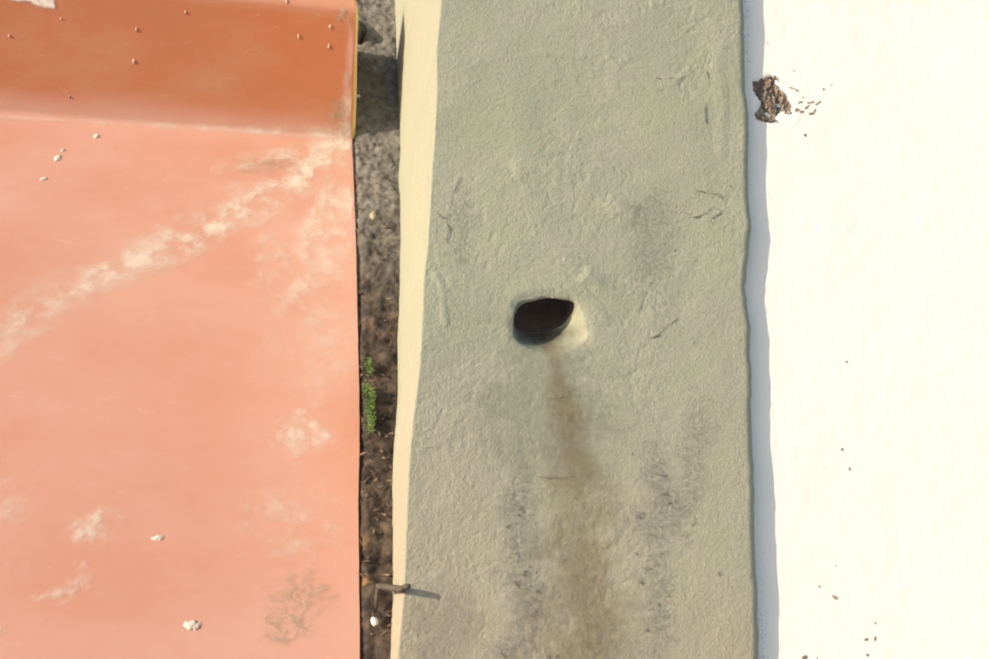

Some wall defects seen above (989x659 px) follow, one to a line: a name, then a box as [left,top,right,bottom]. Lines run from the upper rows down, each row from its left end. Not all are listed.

water stain [519,331,558,343]